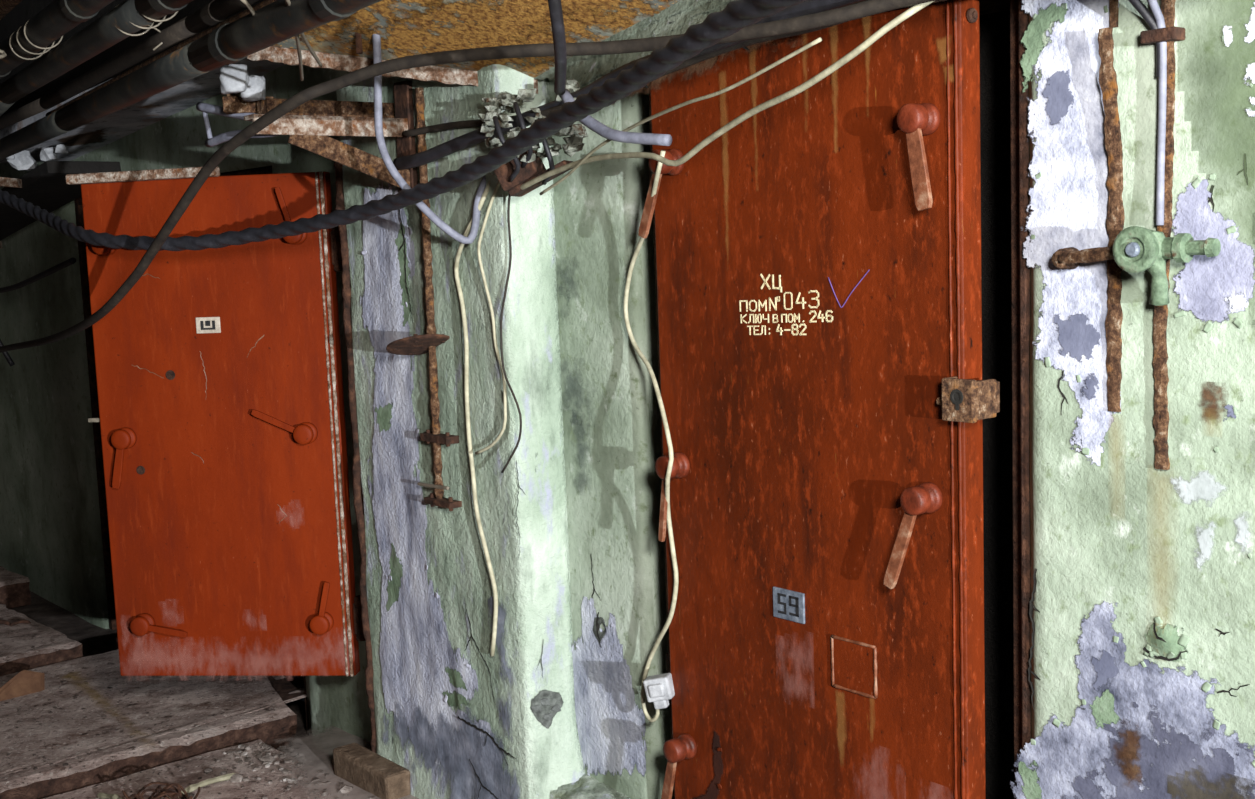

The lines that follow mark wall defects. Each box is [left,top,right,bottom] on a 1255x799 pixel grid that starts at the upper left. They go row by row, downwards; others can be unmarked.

peeling [364,182,398,204]
rust [299,0,673,74]
peeling [1020,0,1122,466]
rust [1098,27,1125,412]
rust [1157,0,1176,237]
peeling [1171,173,1255,333]
peeling [1221,2,1255,47]
peeling [1244,62,1255,117]
rust [1153,259,1170,470]
peeling [360,208,494,745]
peeling [530,596,647,777]
peeling [1010,601,1255,799]